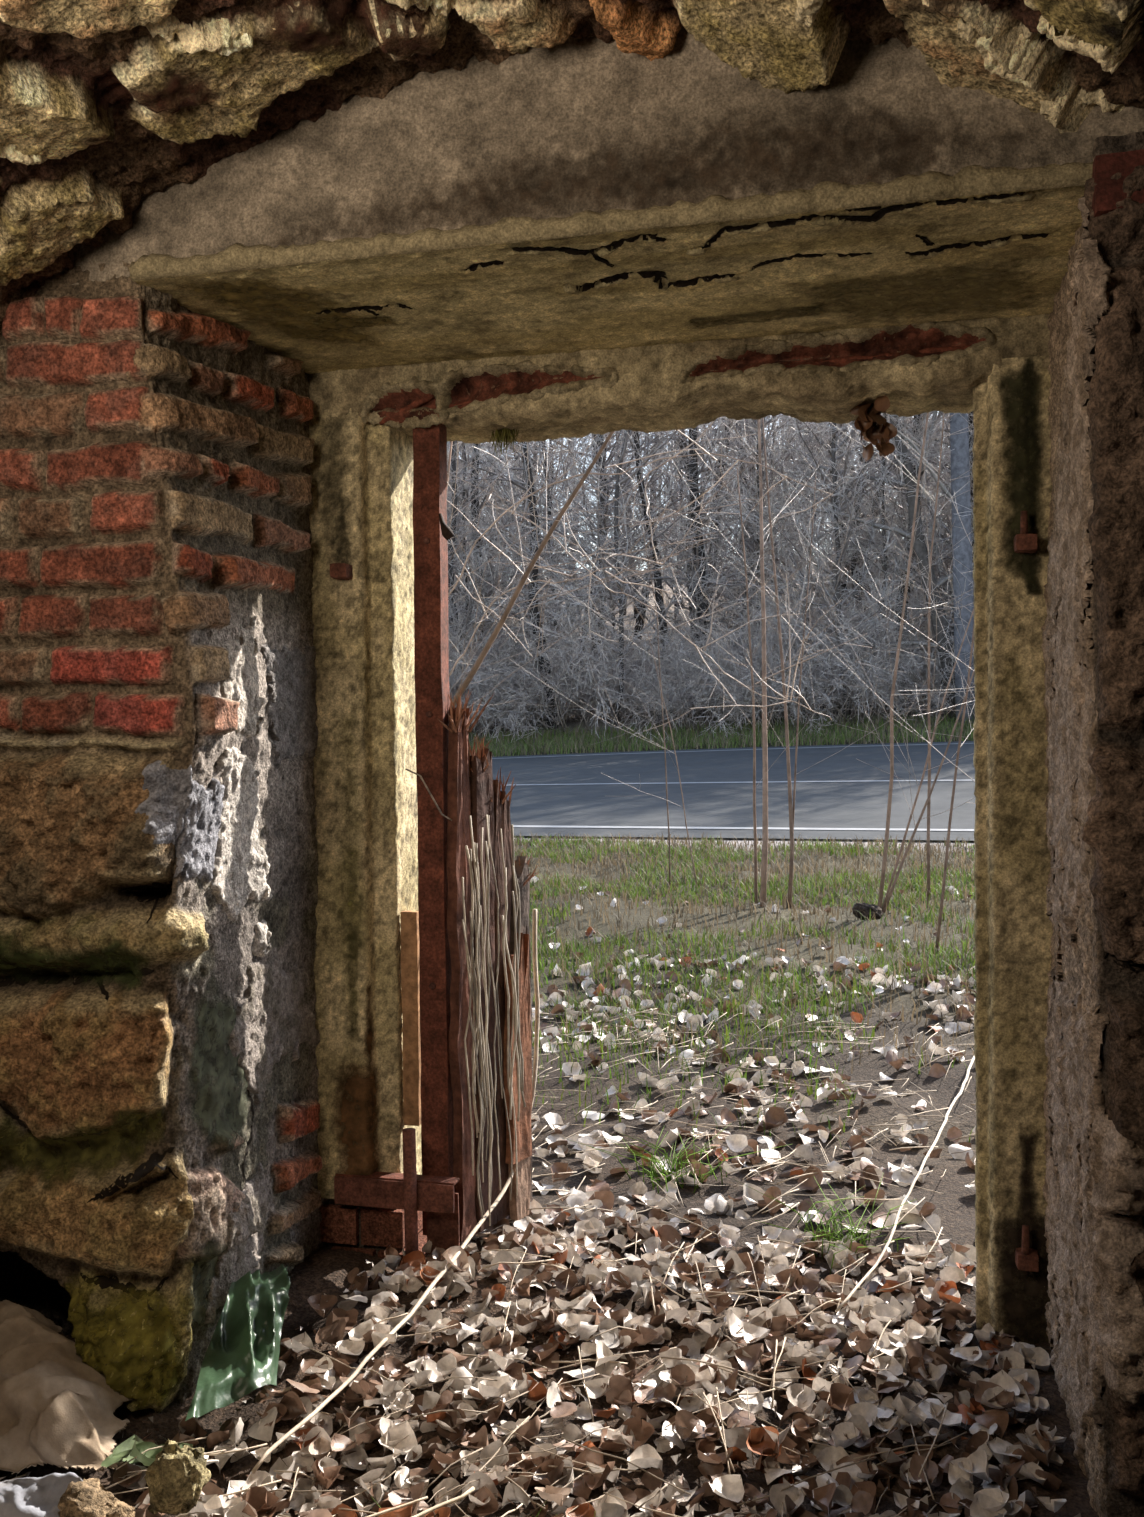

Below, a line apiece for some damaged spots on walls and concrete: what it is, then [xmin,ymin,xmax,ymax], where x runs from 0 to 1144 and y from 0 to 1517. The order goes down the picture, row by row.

crack [463,191,1049,295]
crack [316,303,412,316]